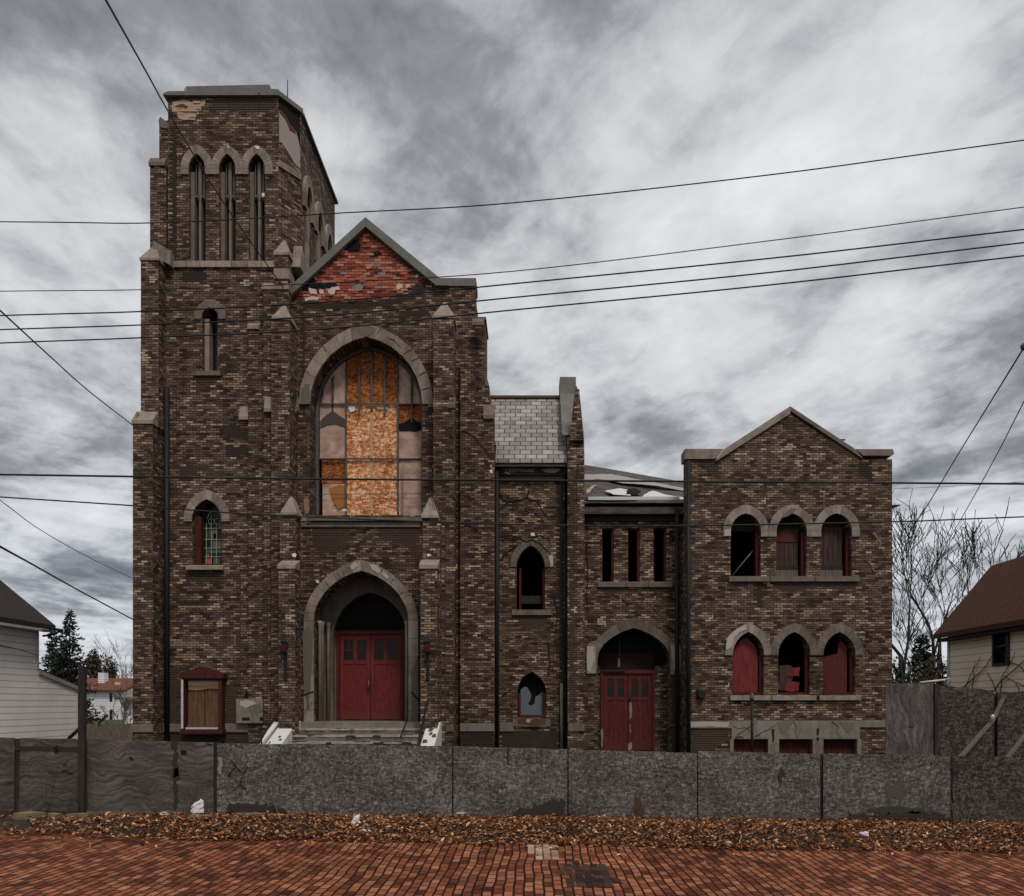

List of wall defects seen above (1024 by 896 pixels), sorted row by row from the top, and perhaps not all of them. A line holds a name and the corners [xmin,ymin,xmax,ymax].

spalling [172,100,206,120]
flaking render [294,231,423,304]